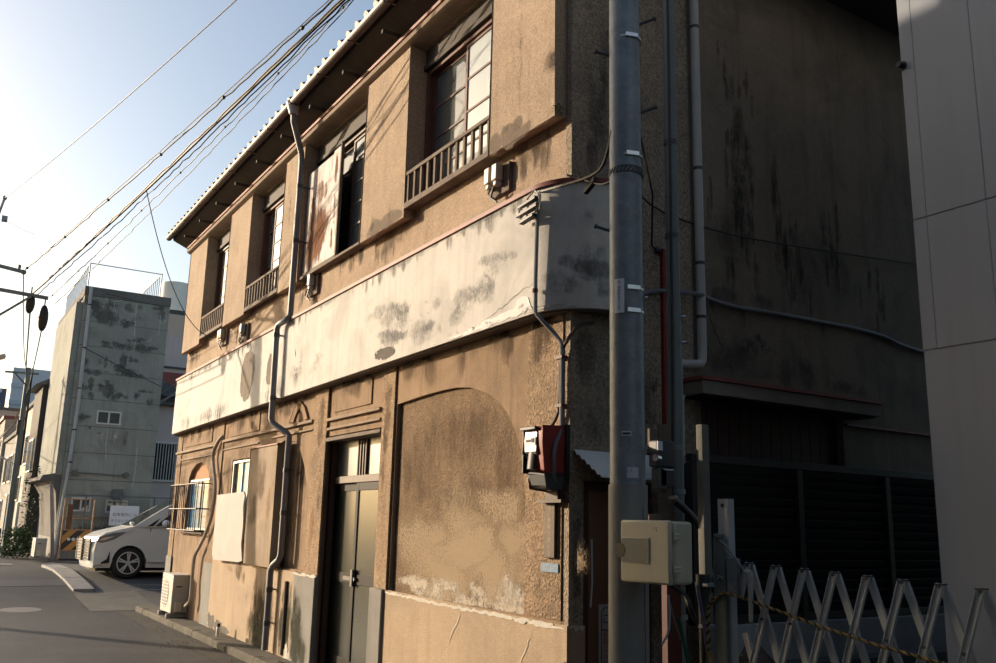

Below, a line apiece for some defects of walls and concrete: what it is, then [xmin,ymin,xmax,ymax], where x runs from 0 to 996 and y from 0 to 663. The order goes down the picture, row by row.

rust [305,154,338,270]
leakage [246,591,305,663]